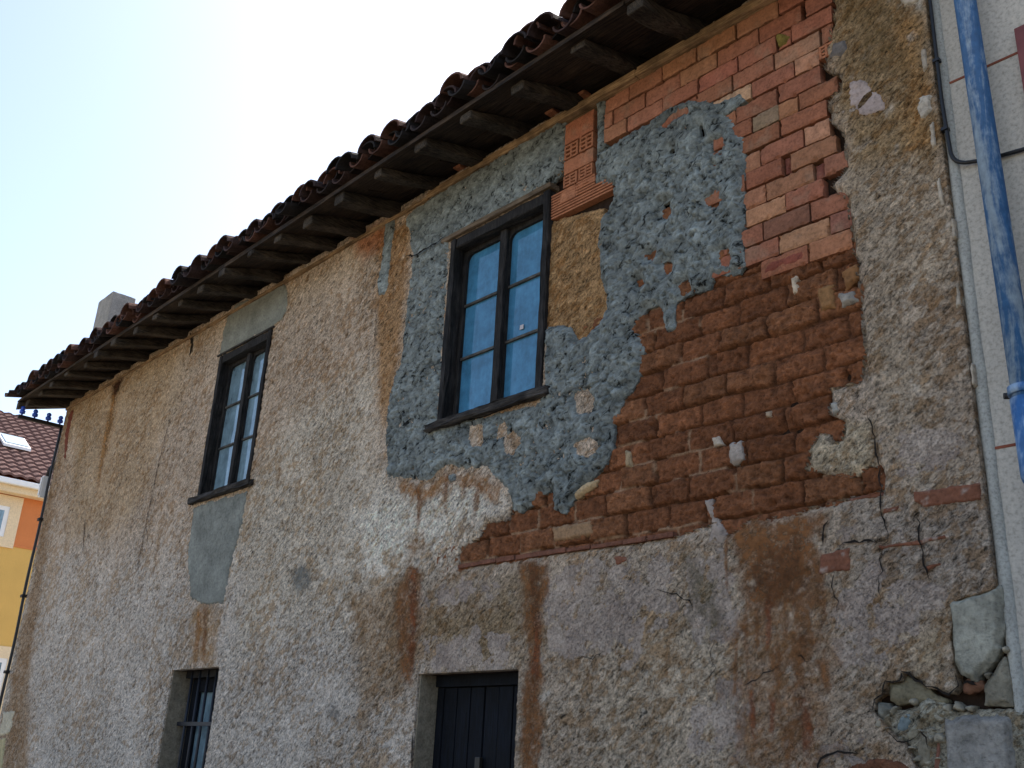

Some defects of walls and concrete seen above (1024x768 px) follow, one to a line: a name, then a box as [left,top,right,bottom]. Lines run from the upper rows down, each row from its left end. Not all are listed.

flaking render [551,0,885,281]
rust [395,568,421,681]
rust [519,562,549,768]
rust [725,513,825,765]
crack [821,402,889,597]
crack [917,519,929,579]
spalling [851,585,1024,768]